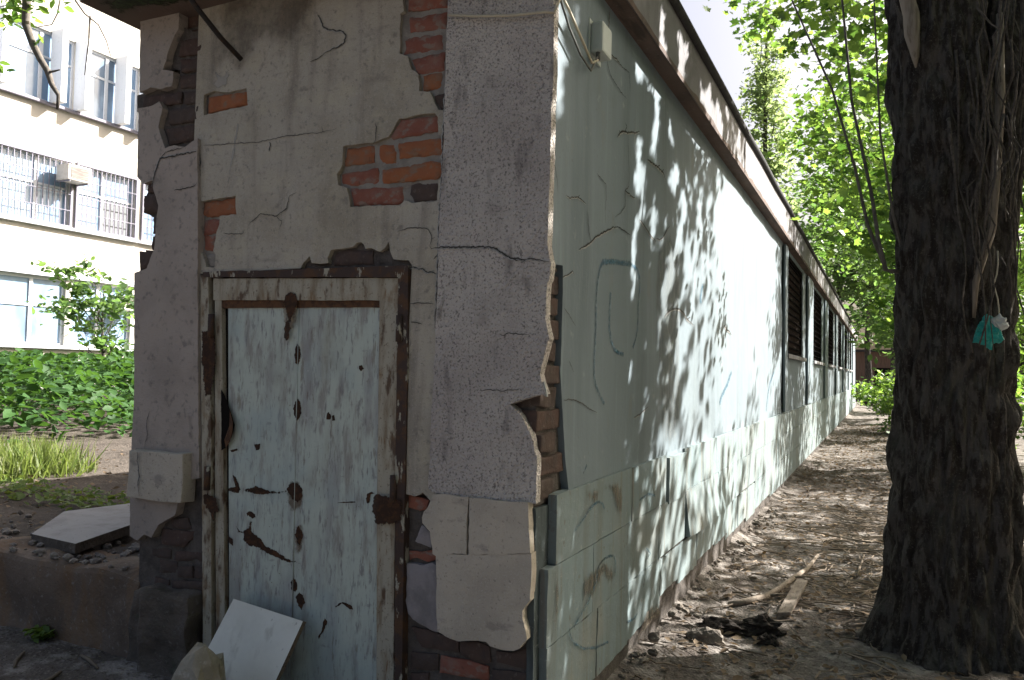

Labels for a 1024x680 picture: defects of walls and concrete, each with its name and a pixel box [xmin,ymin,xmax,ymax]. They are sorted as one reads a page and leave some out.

crack [310,15,346,62]
flaking render [137,28,248,147]
flaking render [340,0,448,207]
crack [607,54,665,179]
crack [152,129,334,190]
crack [400,73,670,324]
corrosion [283,292,301,364]
spalling [515,268,563,506]
corrosion [228,475,303,509]
corrosion [228,511,303,563]
corrosion [338,492,402,526]
flaking render [411,626,527,680]